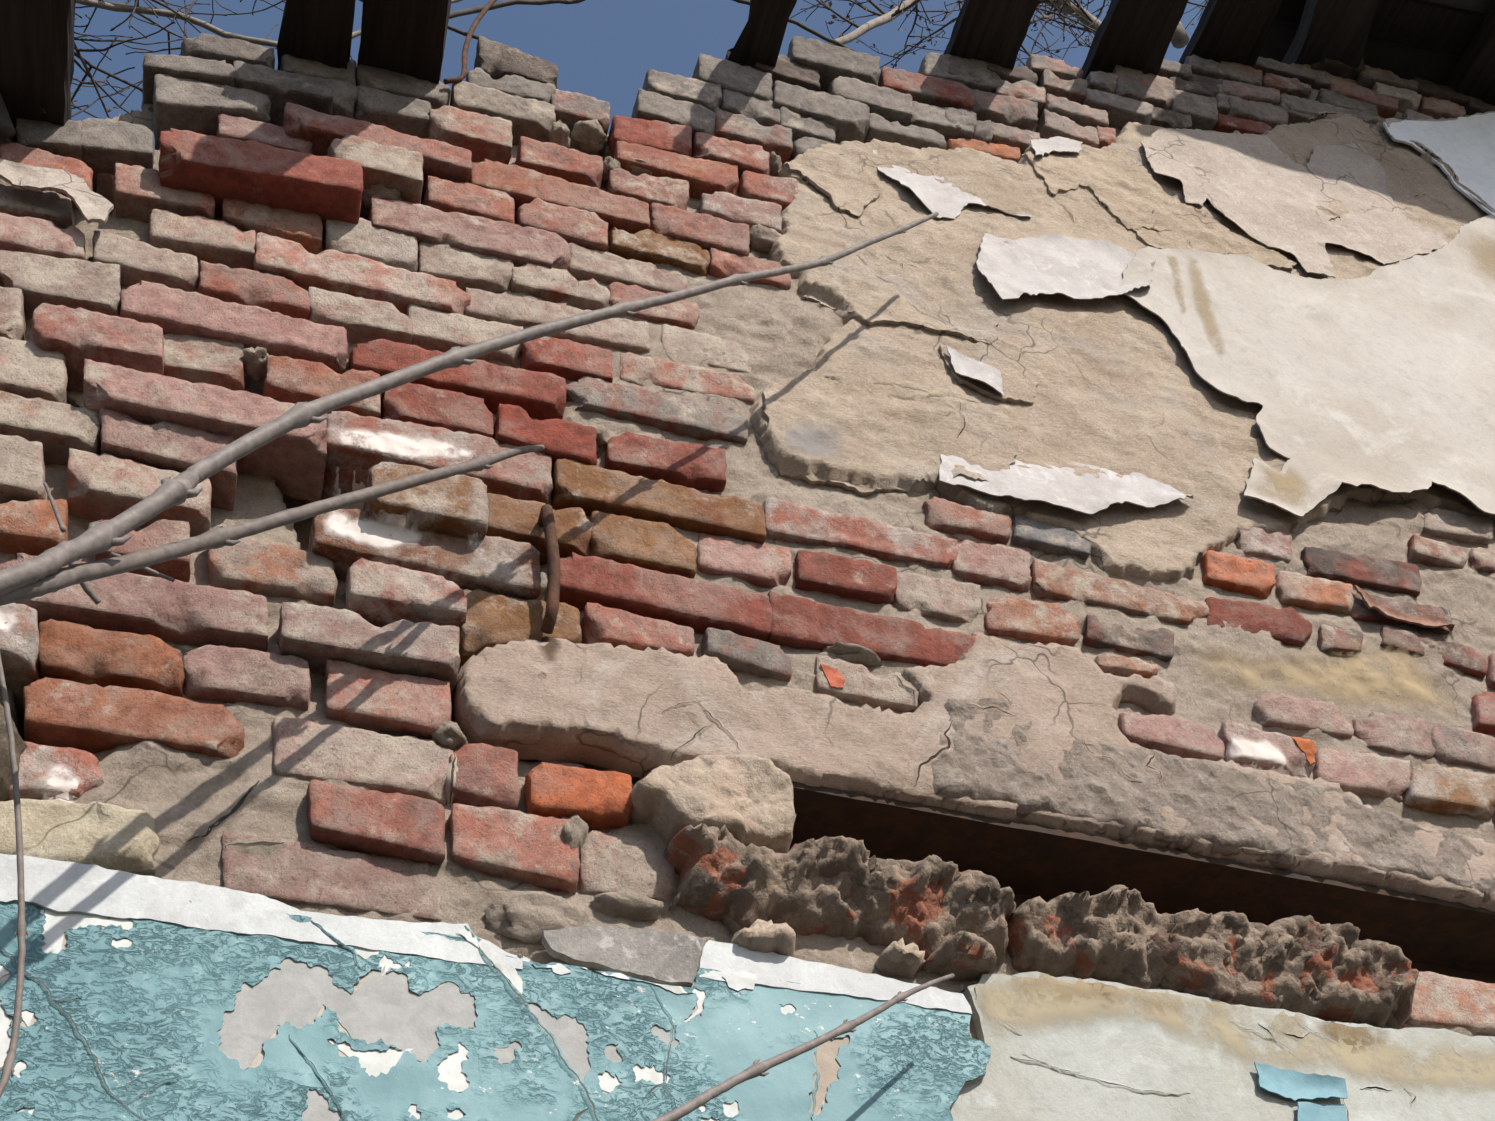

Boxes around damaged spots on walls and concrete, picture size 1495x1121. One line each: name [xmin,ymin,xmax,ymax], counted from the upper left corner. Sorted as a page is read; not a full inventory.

flaking render [872,150,1032,220]
flaking render [1141,128,1449,278]
flaking render [976,233,1156,300]
leakage [1171,257,1216,336]
flaking render [946,346,1004,397]
crack [894,675,917,705]
crack [913,691,1018,788]
peeling [217,947,478,1121]
peeling [457,931,706,1092]
crack [961,984,1190,1097]
crack [1231,1016,1343,1063]
peeling [1254,1062,1348,1121]